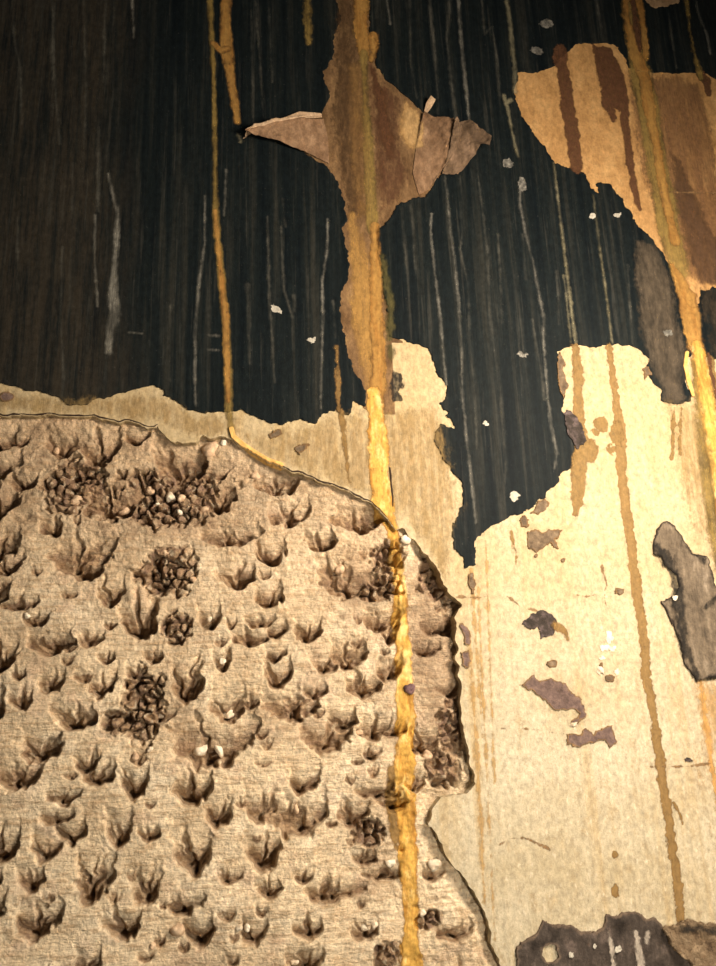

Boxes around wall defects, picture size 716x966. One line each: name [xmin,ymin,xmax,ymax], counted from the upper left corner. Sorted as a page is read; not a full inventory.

rust [207,0,283,471]
peeling [243,0,492,415]
water stain [552,44,583,174]
peeling [514,43,670,265]
water stain [592,44,656,211]
rust [622,0,716,564]
peeling [649,72,716,234]
water stain [651,70,716,285]
peeling [685,267,716,305]
rust [334,345,351,483]
rust [349,0,423,966]
water stain [634,930,650,966]